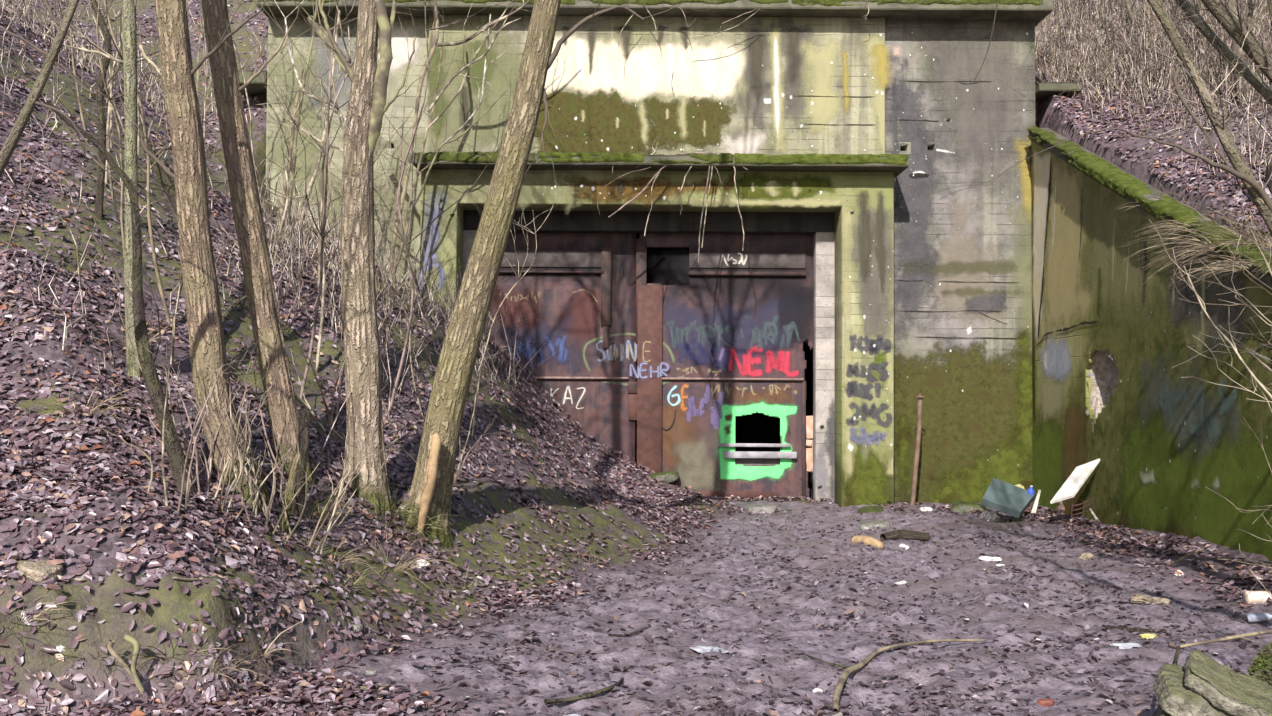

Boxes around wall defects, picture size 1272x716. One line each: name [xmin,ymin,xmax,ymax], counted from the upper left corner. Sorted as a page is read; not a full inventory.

damp [544,19,850,155]
damp [690,29,1146,461]
damp [1168,237,1246,347]
corrosion [662,404,697,467]
corrosion [730,387,792,405]
damp [815,336,868,498]
damp [888,412,911,491]
spalling [1086,349,1119,432]